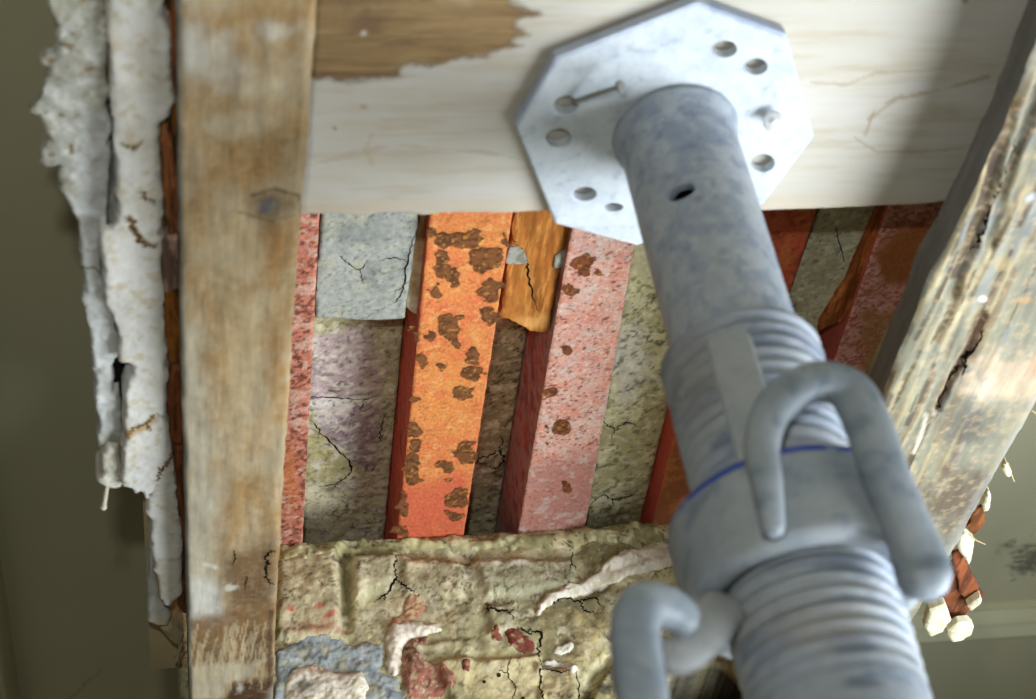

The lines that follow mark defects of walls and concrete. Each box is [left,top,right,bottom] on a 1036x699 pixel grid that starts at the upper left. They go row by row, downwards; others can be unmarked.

flaking render [29,0,183,606]
crack [340,229,417,302]
corrosion [427,228,510,327]
corrosion [561,253,601,297]
corrosion [408,314,488,401]
corrosion [545,420,571,445]
corrosion [435,441,478,522]
crack [372,555,414,602]
spalling [387,593,427,627]
spalling [401,637,471,699]
spalling [491,624,535,654]
crack [485,597,604,699]